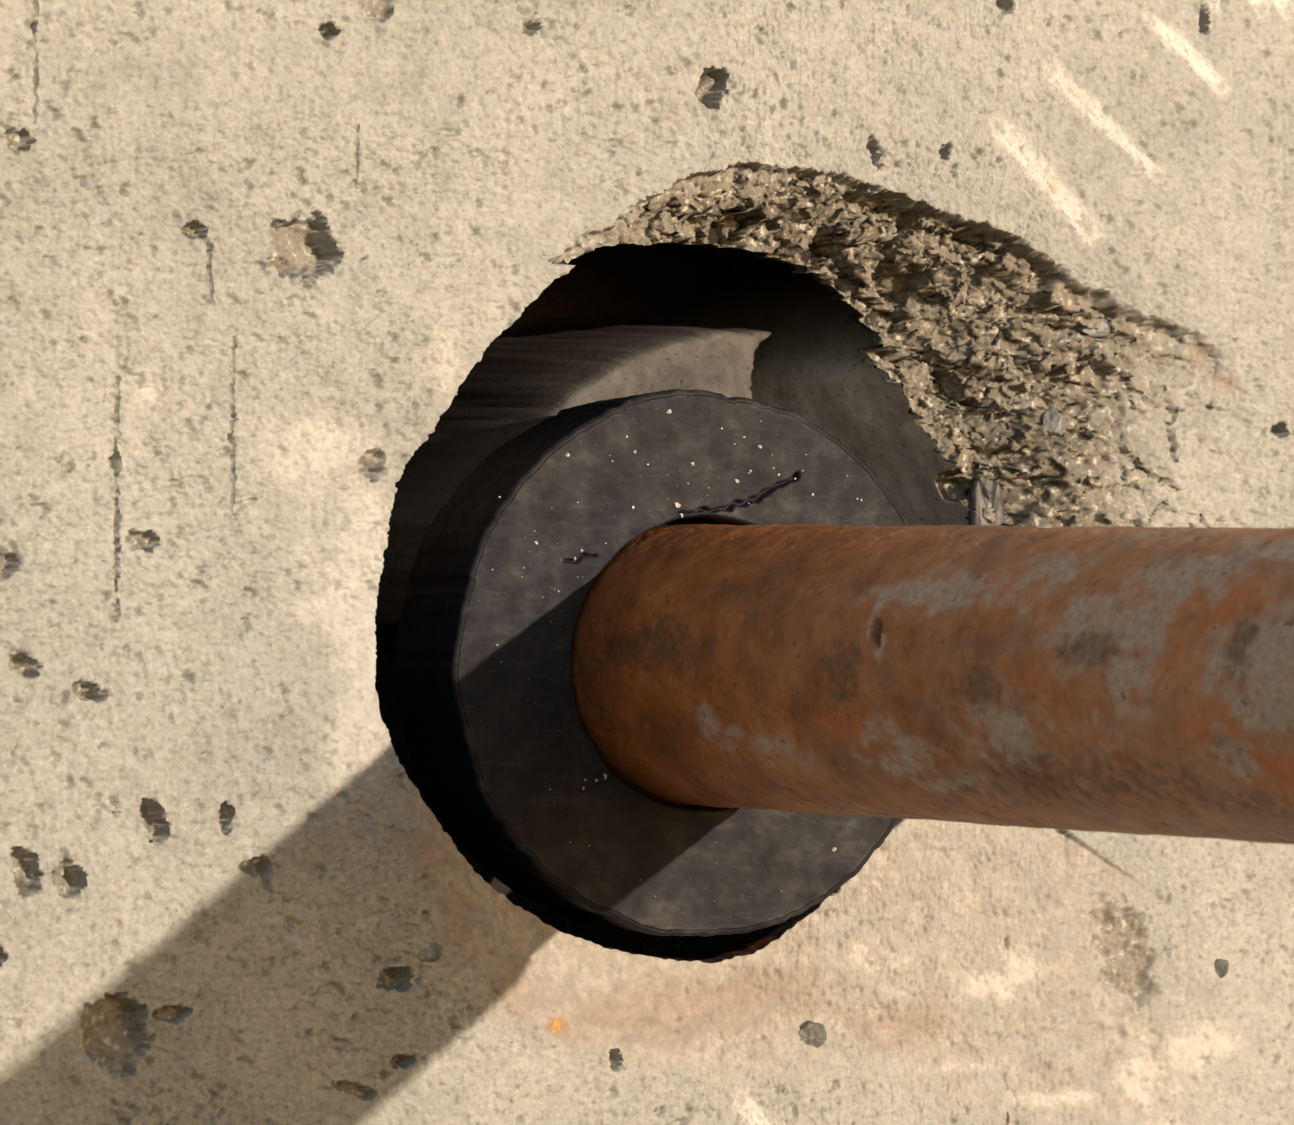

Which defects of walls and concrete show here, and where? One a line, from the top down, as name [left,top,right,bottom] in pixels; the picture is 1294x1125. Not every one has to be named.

spalling [546,134,1290,528]